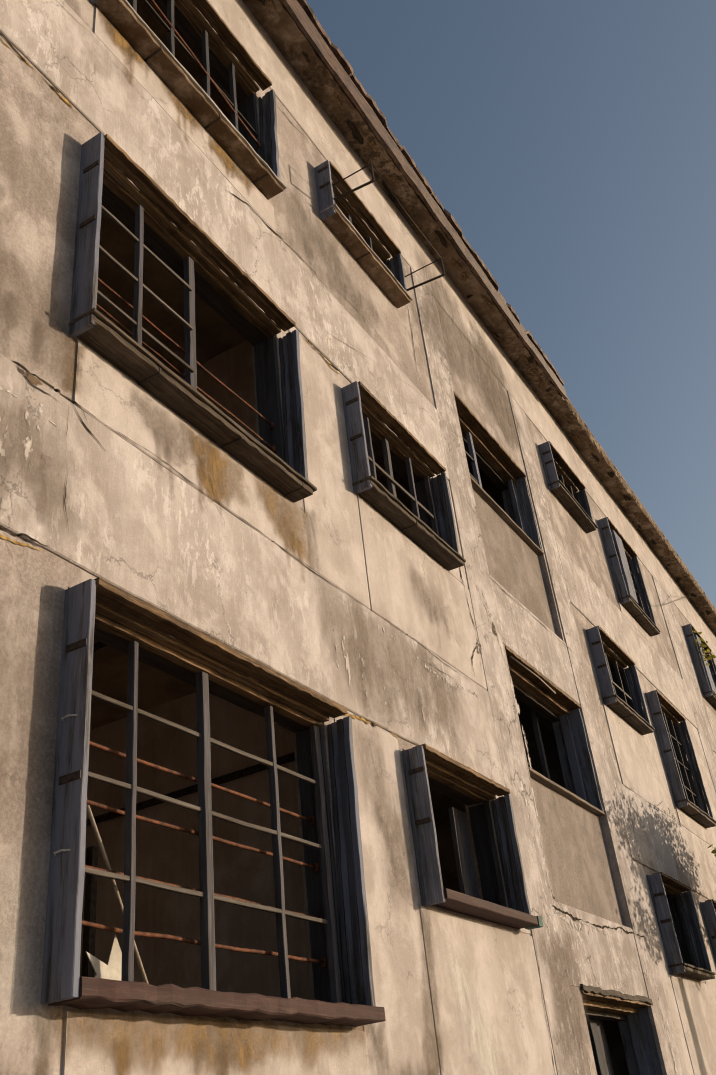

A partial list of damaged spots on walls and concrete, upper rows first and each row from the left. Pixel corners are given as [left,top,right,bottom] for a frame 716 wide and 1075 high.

crack [226,190,423,393]
crack [0,354,578,679]